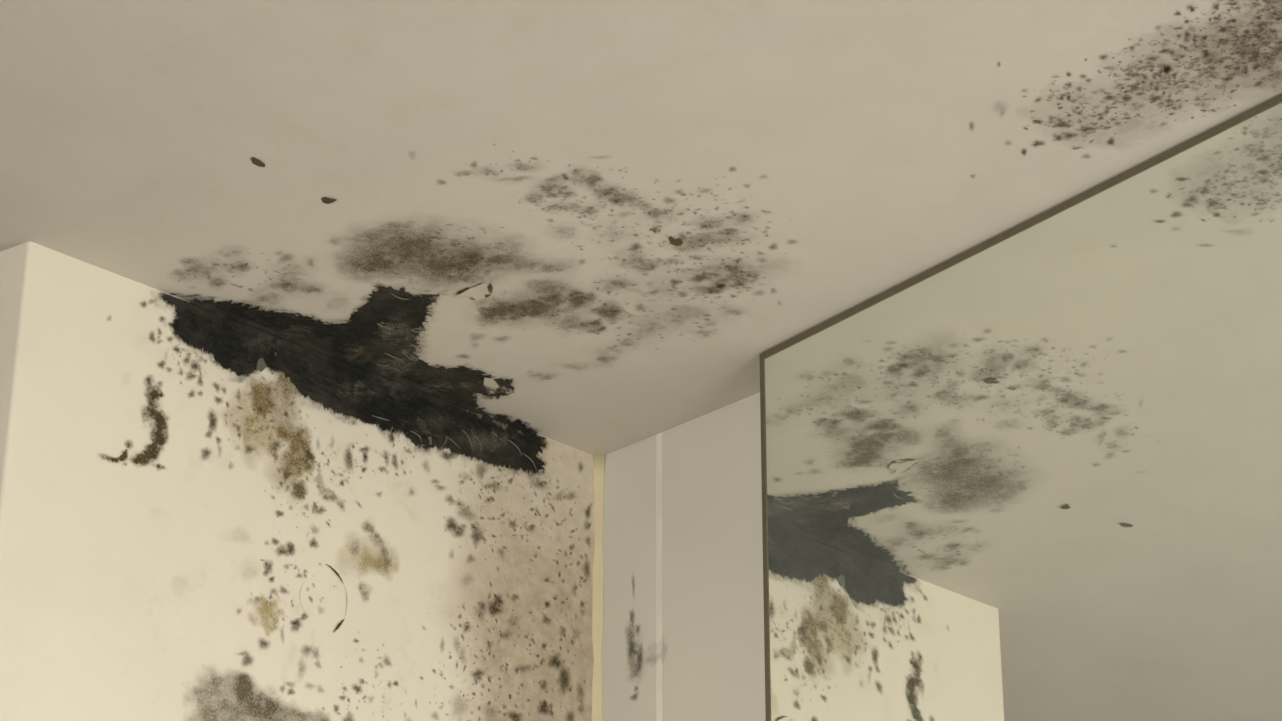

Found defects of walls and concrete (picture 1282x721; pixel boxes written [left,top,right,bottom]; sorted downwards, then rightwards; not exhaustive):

water stain [1022,0,1282,155]
water stain [351,233,516,277]
water stain [485,287,619,334]
water stain [108,378,168,468]
water stain [150,317,343,525]
water stain [448,517,496,543]
water stain [465,595,517,640]
water stain [200,656,365,721]
water stain [530,635,573,691]